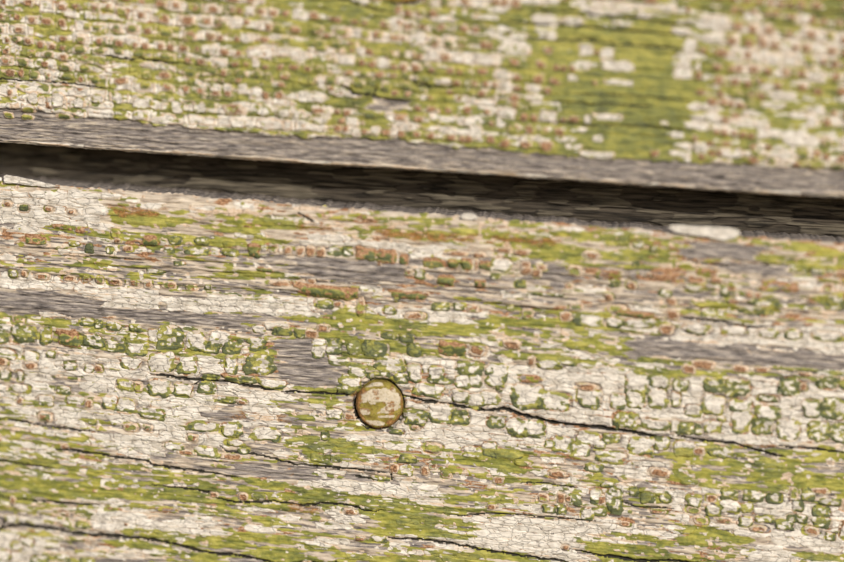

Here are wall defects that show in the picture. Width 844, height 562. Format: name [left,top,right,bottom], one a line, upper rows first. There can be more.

peeling [365,98,410,111]
peeling [0,175,166,252]
peeling [188,199,502,410]
peeling [523,221,826,306]
crack [0,413,393,512]
peeling [0,252,844,562]
crack [403,394,844,458]
crack [0,495,273,562]